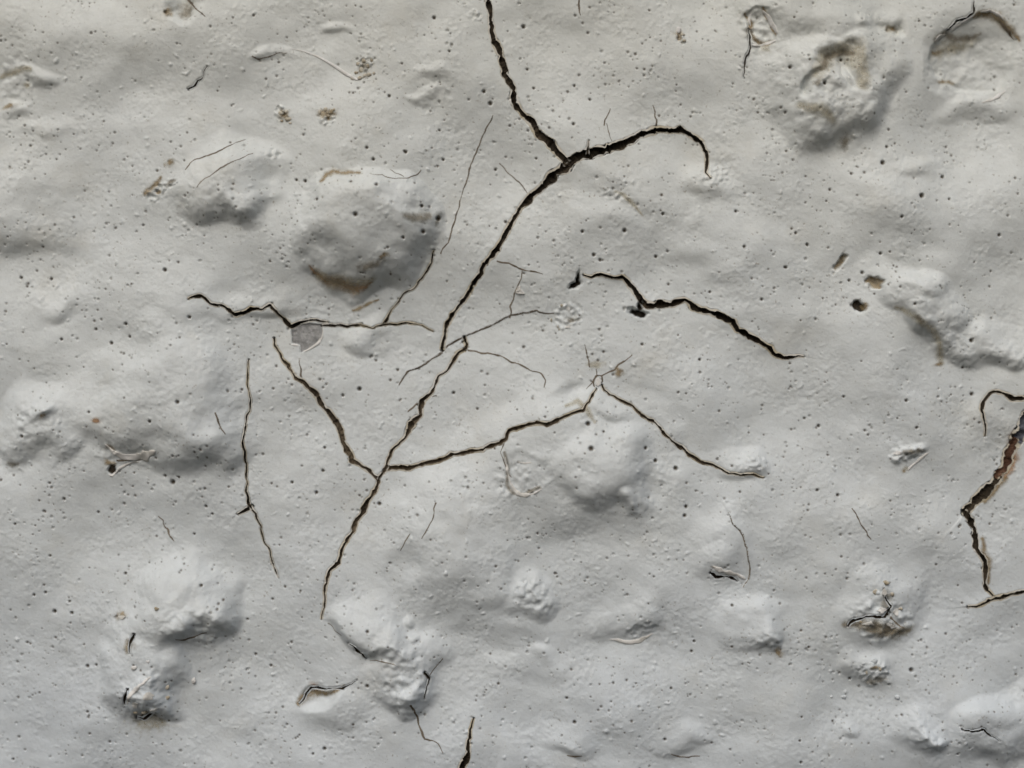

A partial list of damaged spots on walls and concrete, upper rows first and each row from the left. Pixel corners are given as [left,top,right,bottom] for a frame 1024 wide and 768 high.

crack [947,0,1014,40]
spalling [292,323,323,352]
crack [185,0,764,704]
crack [583,272,804,360]
crack [961,389,1024,608]
crack [409,658,475,768]